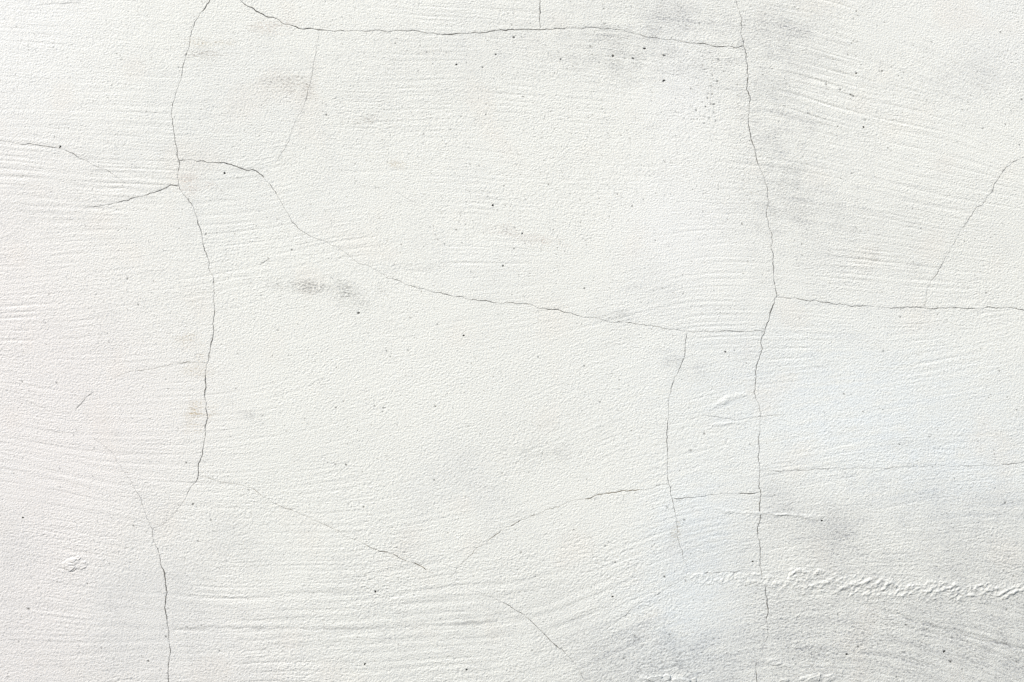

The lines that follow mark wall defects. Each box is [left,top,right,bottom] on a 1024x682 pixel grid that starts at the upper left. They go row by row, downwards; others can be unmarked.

crack [79,0,426,682]
crack [362,2,1023,682]